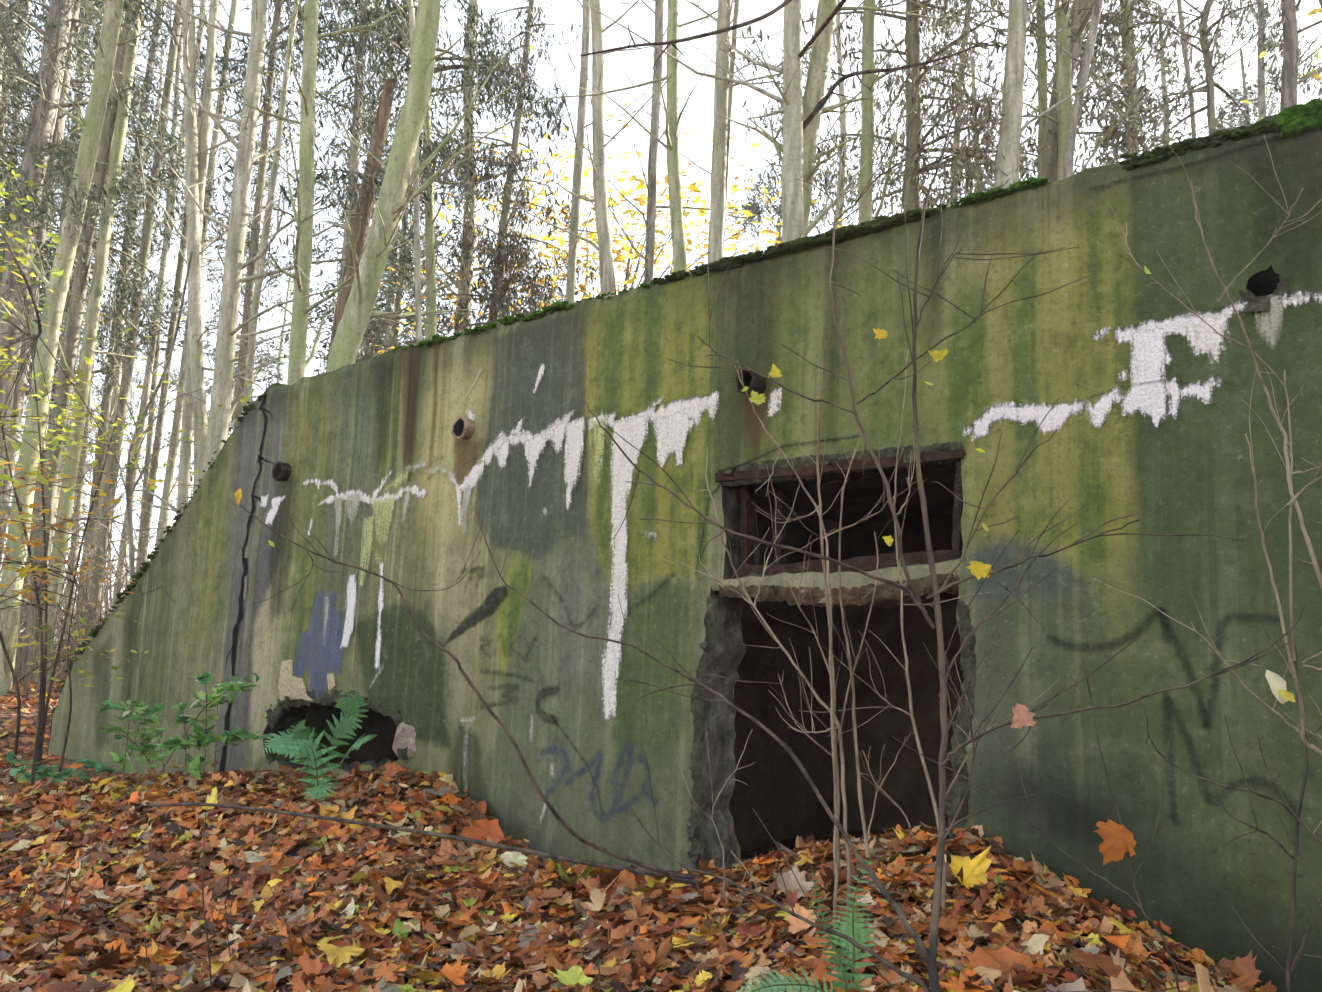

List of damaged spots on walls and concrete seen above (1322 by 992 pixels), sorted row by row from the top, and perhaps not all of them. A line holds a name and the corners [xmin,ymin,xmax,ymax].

water stain [767,388,782,416]
water stain [964,291,1322,442]
crack [219,383,273,772]
spalling [263,659,417,760]
water stain [303,391,719,719]
spalling [687,571,977,873]